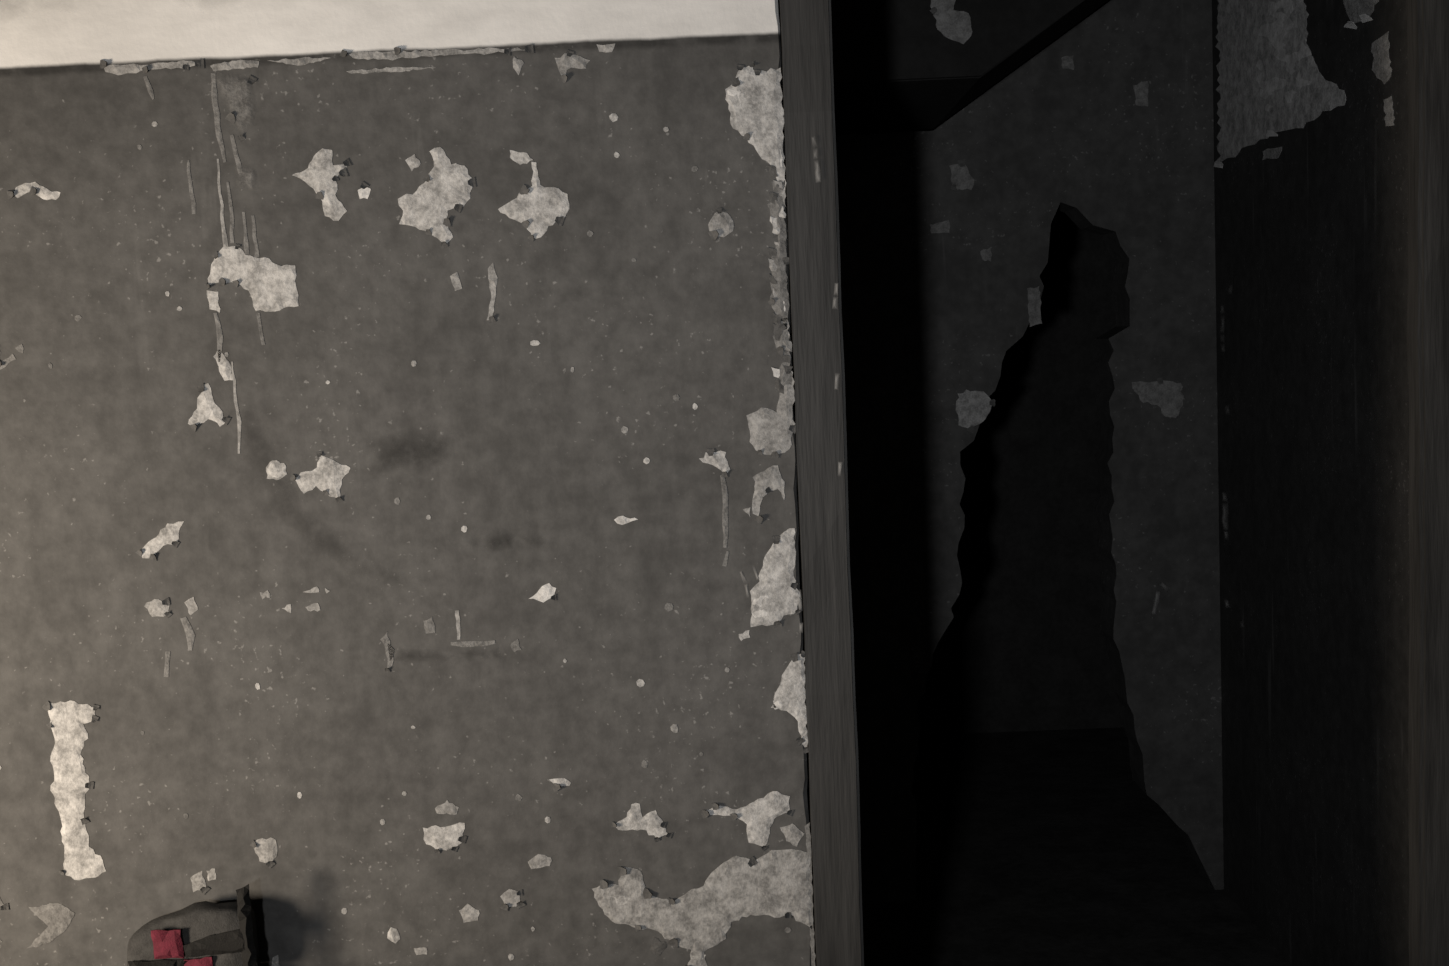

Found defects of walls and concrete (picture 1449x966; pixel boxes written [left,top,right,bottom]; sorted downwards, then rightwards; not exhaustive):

peeling [555,43,615,83]
peeling [930,0,972,44]
peeling [1214,0,1346,168]
peeling [1371,31,1395,126]
peeling [498,150,569,241]
peeling [100,44,534,454]
flaking render [699,61,802,641]
peeling [266,452,350,503]
flaking render [771,650,809,753]
peeling [42,700,106,880]
peeling [423,800,467,854]
peeling [592,791,816,966]